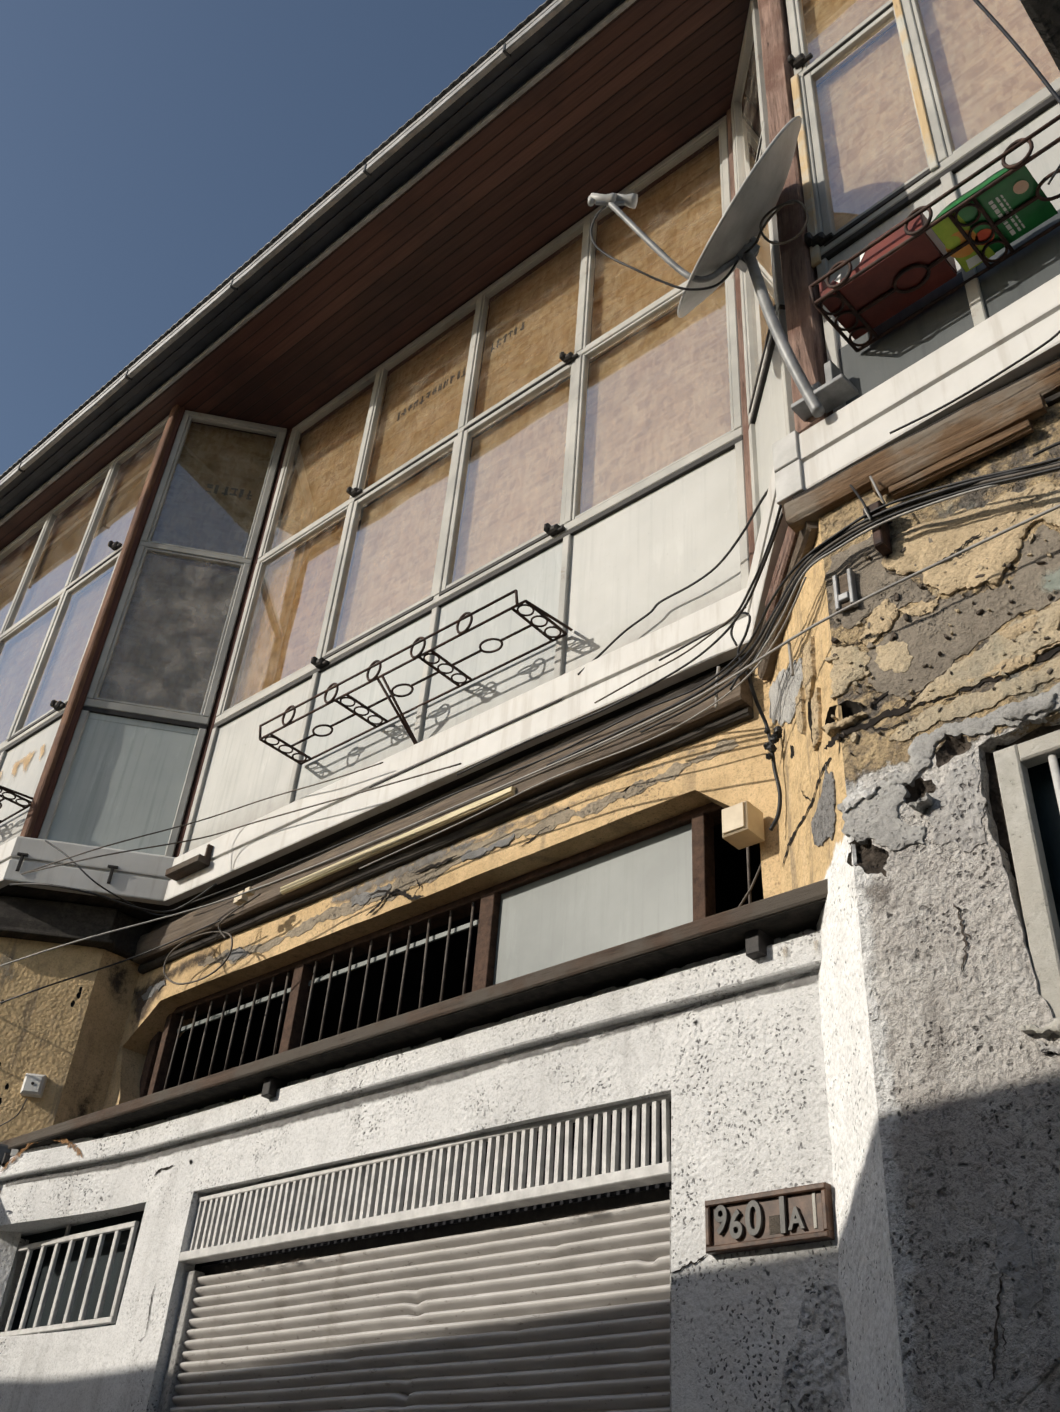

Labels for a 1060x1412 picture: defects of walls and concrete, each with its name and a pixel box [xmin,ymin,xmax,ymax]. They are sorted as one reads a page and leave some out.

spalling [769,482,1060,907]
spalling [198,739,739,967]
crack [989,1273,1007,1385]